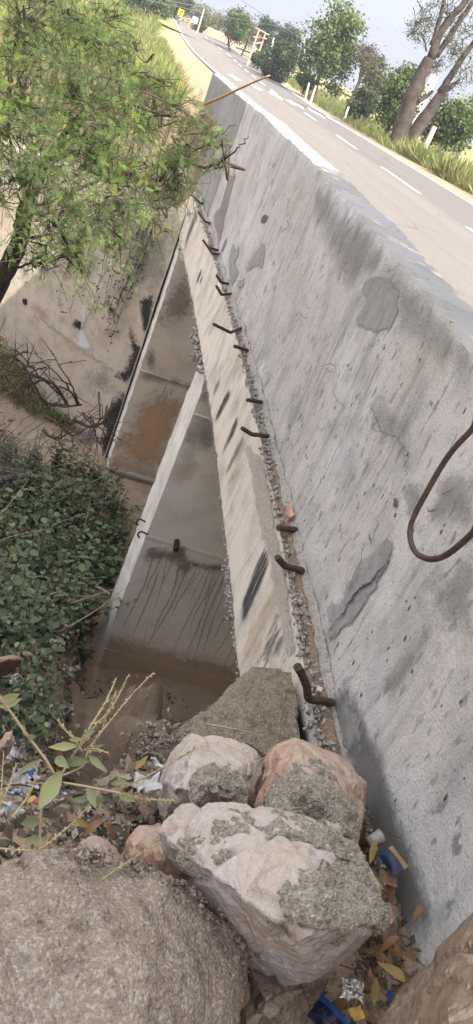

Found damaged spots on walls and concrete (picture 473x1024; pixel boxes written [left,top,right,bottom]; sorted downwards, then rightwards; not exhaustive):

damp [94,235,213,456]
rust [212,323,249,352]
peeling [357,276,399,358]
rust [240,426,270,438]
spalling [194,197,392,767]
rust [276,525,298,533]
rust [274,554,305,574]
damp [120,548,268,673]
rust [293,663,336,707]